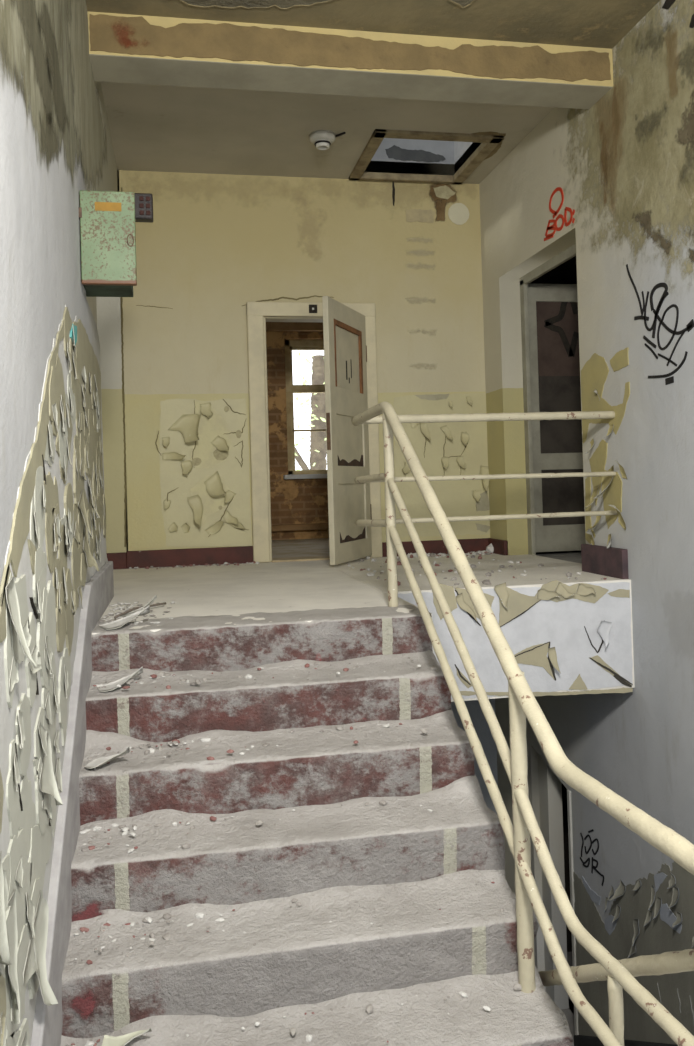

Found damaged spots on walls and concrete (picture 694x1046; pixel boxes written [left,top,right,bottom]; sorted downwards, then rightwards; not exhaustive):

mould [0,0,107,191]
spalling [89,14,611,82]
leakage [567,0,694,274]
peeling [155,399,252,547]
peeling [581,347,630,548]
peeling [0,305,108,1046]
peeling [398,583,509,699]
peeling [482,580,633,696]
peeling [573,861,694,960]
peeling [577,980,609,1027]
peeling [623,989,677,1045]
peeling [634,971,694,1036]